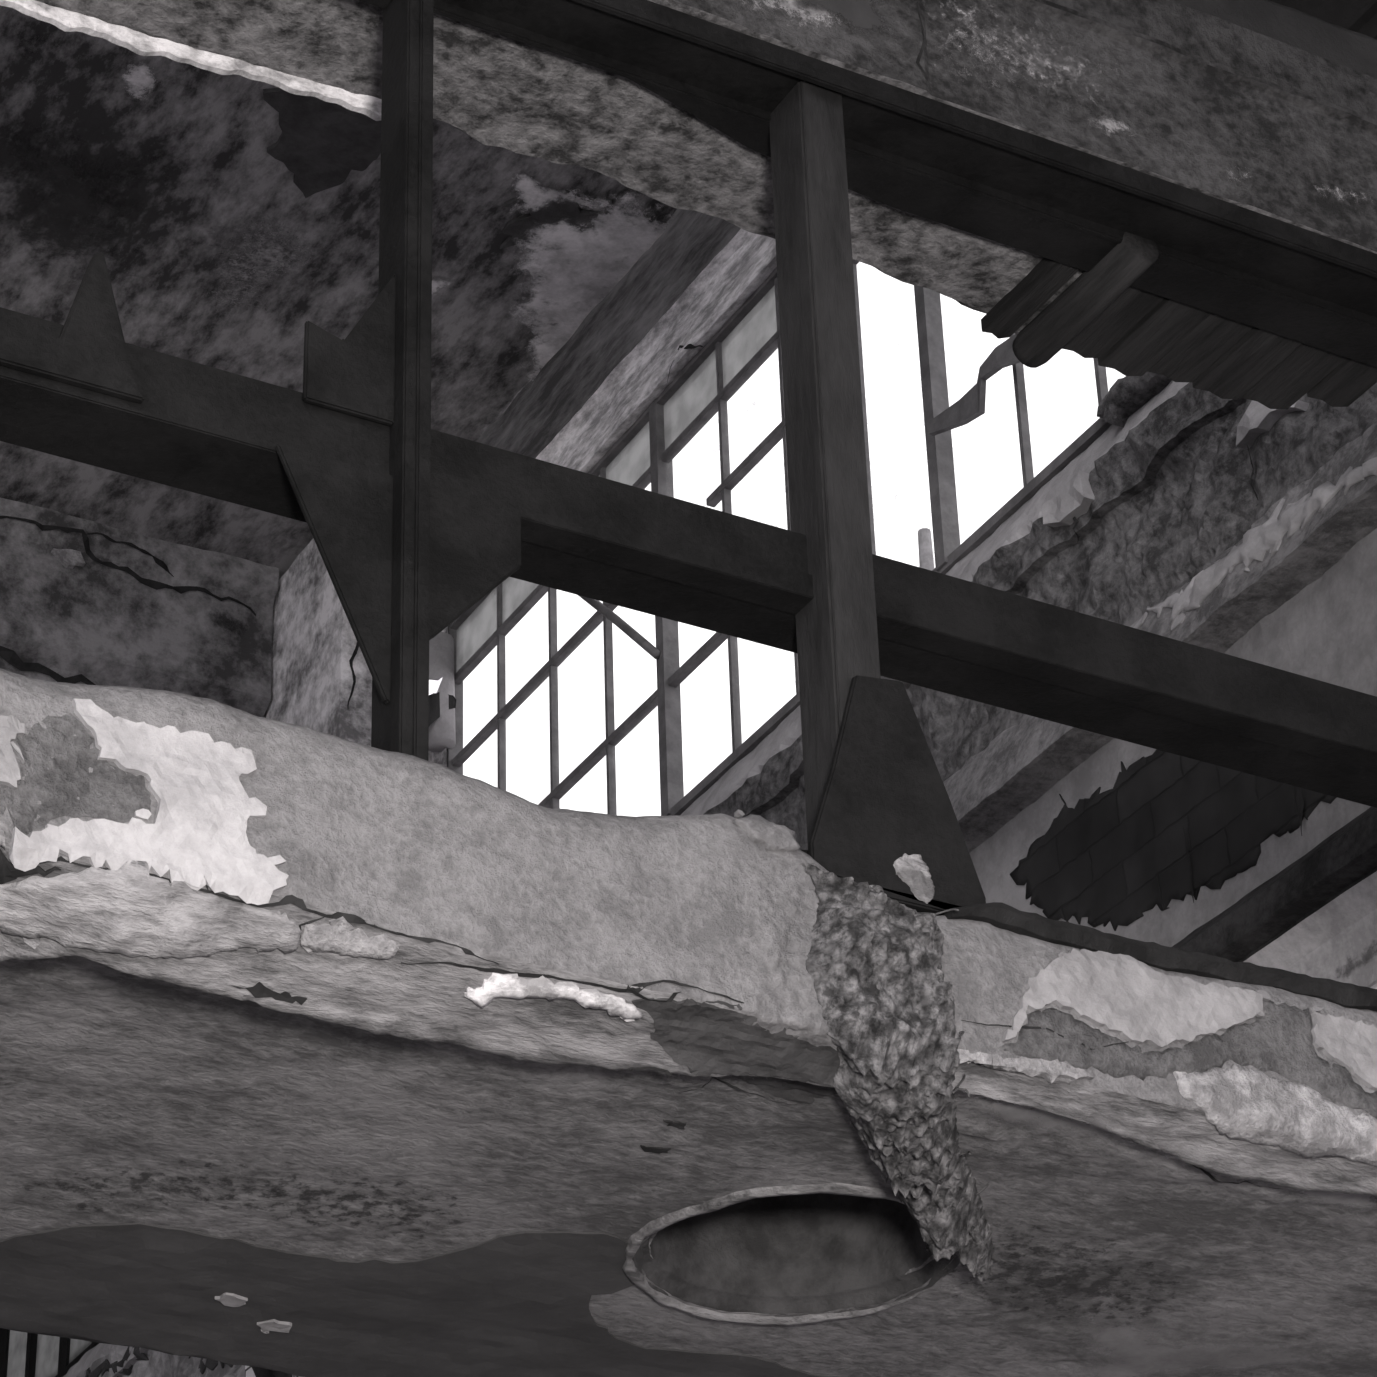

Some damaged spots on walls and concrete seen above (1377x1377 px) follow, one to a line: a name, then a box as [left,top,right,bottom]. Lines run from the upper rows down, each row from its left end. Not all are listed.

flaking render [0,0,382,198]
spalling [1097,371,1172,428]
spalling [1236,400,1309,449]
crack [0,516,256,616]
spalling [1042,470,1095,527]
spalling [1133,457,1377,631]
crack [347,642,359,709]
peeling [0,699,399,960]
flaking render [464,972,840,1104]
flaking render [957,948,1377,1167]
flaking render [0,1222,838,1377]